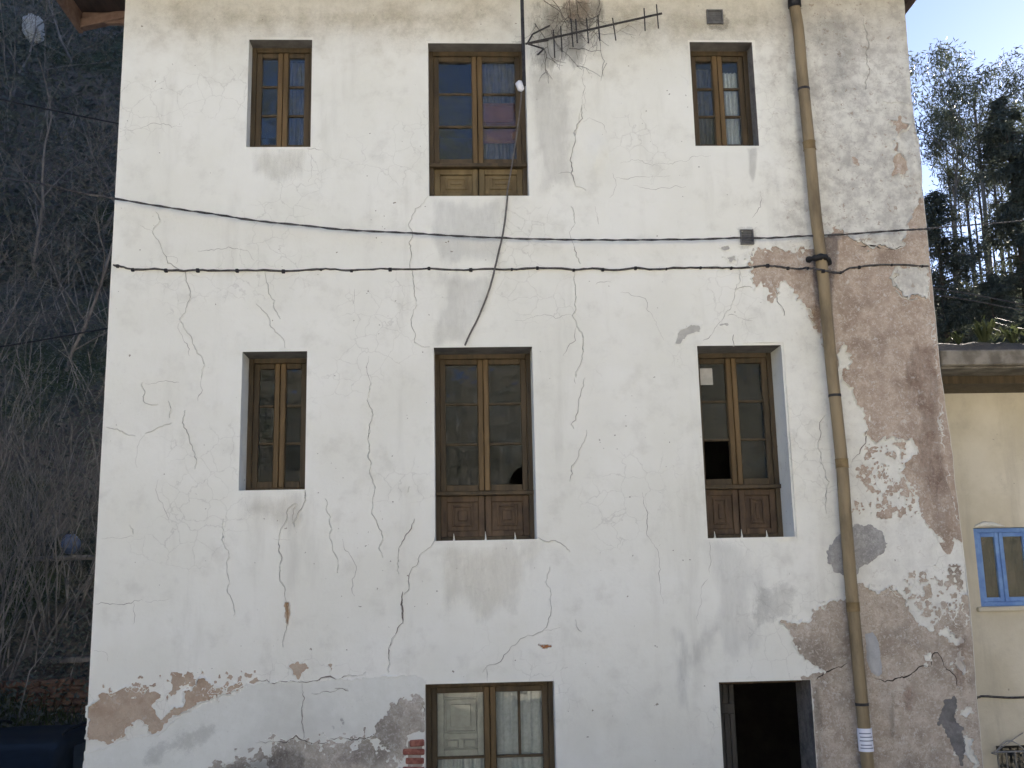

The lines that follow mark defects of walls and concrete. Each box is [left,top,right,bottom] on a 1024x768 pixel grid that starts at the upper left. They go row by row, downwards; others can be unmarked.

flaking render [887,113,918,179]
crack [106,212,205,468]
crack [204,247,285,348]
crack [408,197,430,348]
crack [519,51,607,482]
flaking render [717,178,983,768]
flaking render [84,667,265,746]
crack [221,519,236,617]
spalling [207,727,401,768]
crack [256,358,435,745]
crack [483,537,581,675]
crack [875,652,961,692]